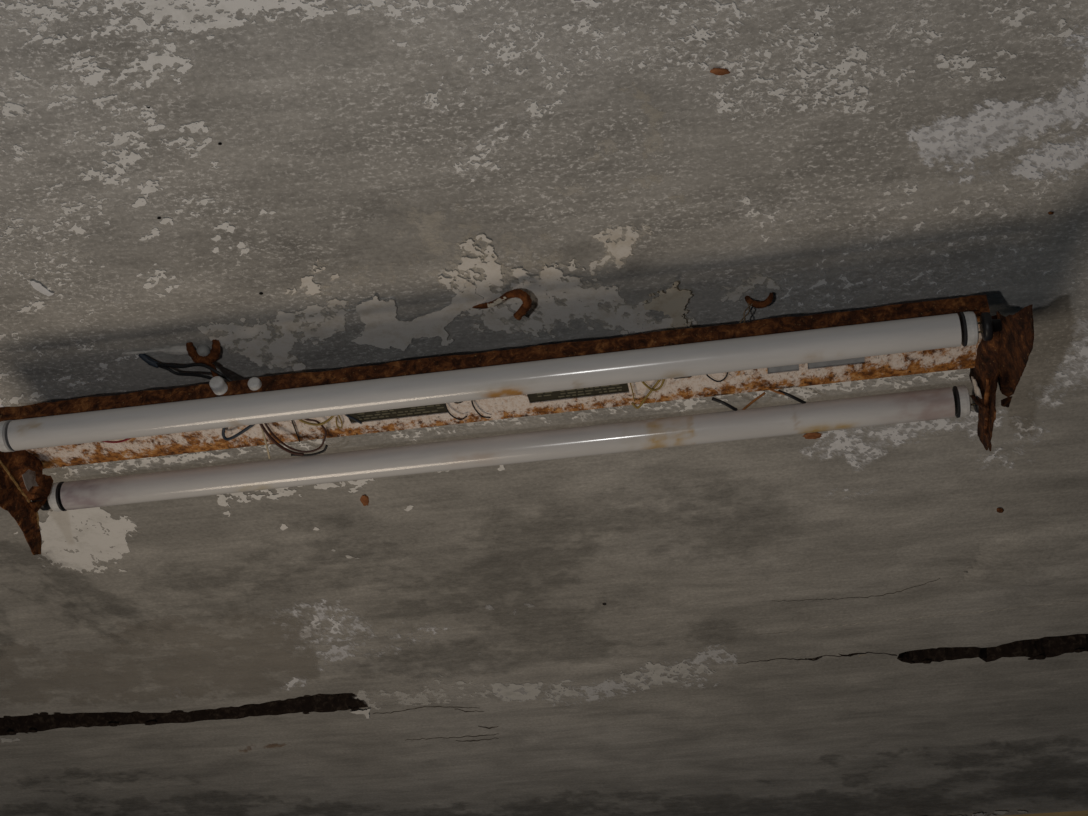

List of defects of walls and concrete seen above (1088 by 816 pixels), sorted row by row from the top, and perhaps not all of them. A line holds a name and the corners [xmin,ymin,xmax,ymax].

peeling [562,0,620,41]
peeling [988,0,1073,39]
peeling [478,24,546,75]
peeling [628,0,915,120]
peeling [887,12,1016,88]
peeling [527,100,562,118]
peeling [0,0,493,313]
peeling [454,144,500,173]
peeling [740,197,760,217]
peeling [197,223,697,373]
peeling [0,354,139,407]
peeling [39,507,137,573]